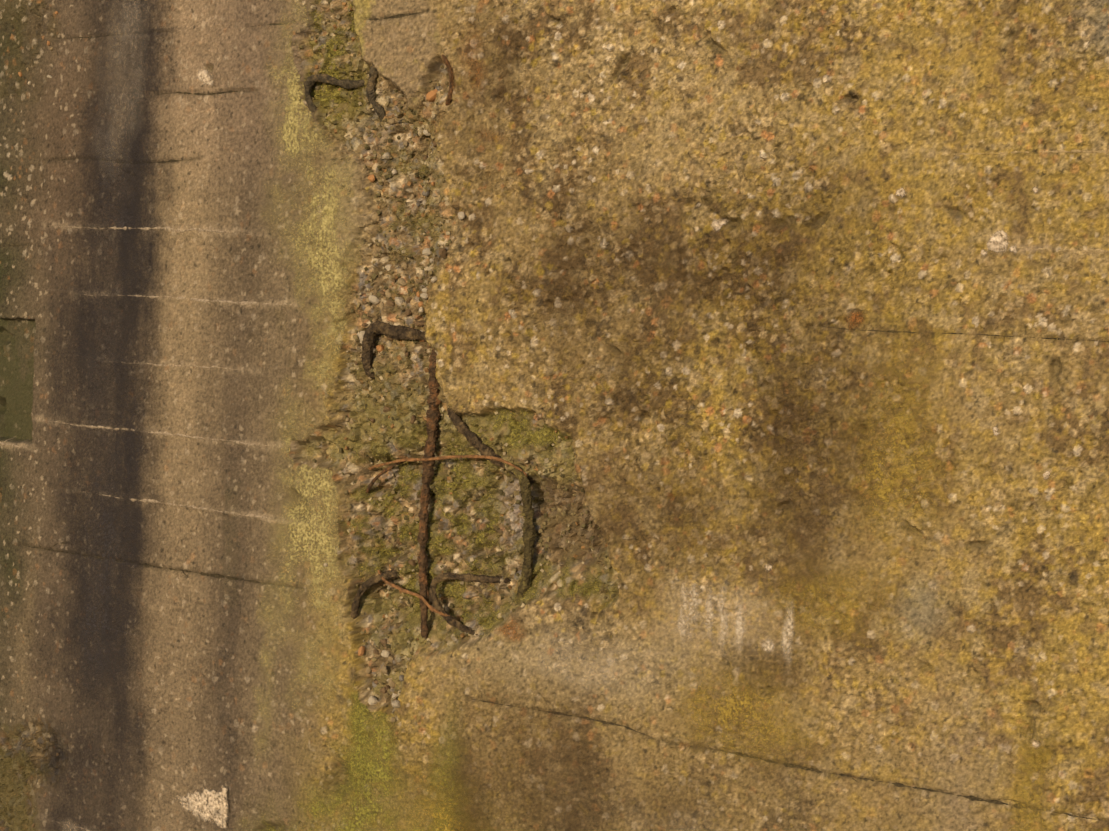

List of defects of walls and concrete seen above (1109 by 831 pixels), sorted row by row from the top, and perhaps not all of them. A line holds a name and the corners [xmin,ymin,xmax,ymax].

spalling [609,51,632,85]
spalling [287,0,620,722]
spalling [0,715,73,831]
crack [468,698,1105,821]